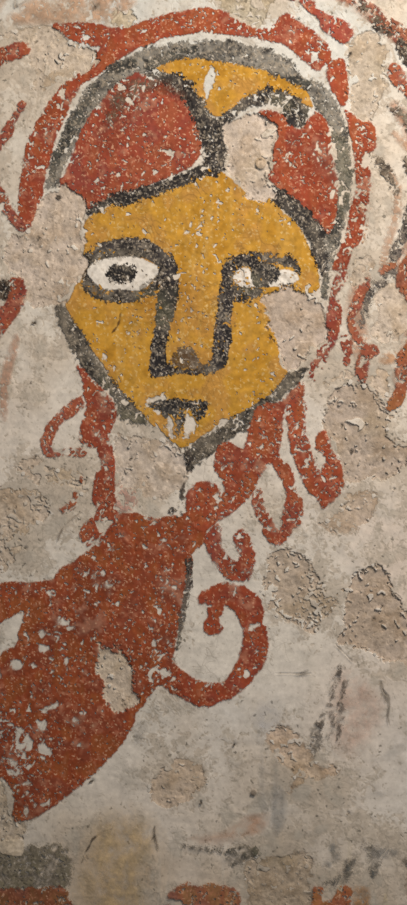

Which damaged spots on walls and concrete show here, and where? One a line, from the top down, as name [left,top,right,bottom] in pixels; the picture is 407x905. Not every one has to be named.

spalling [221,113,279,203]
spalling [259,283,330,370]
spalling [318,367,407,534]
spalling [260,546,407,666]
spalling [95,642,141,713]
spalling [147,758,209,808]
spalling [265,725,341,794]
spalling [243,851,313,905]